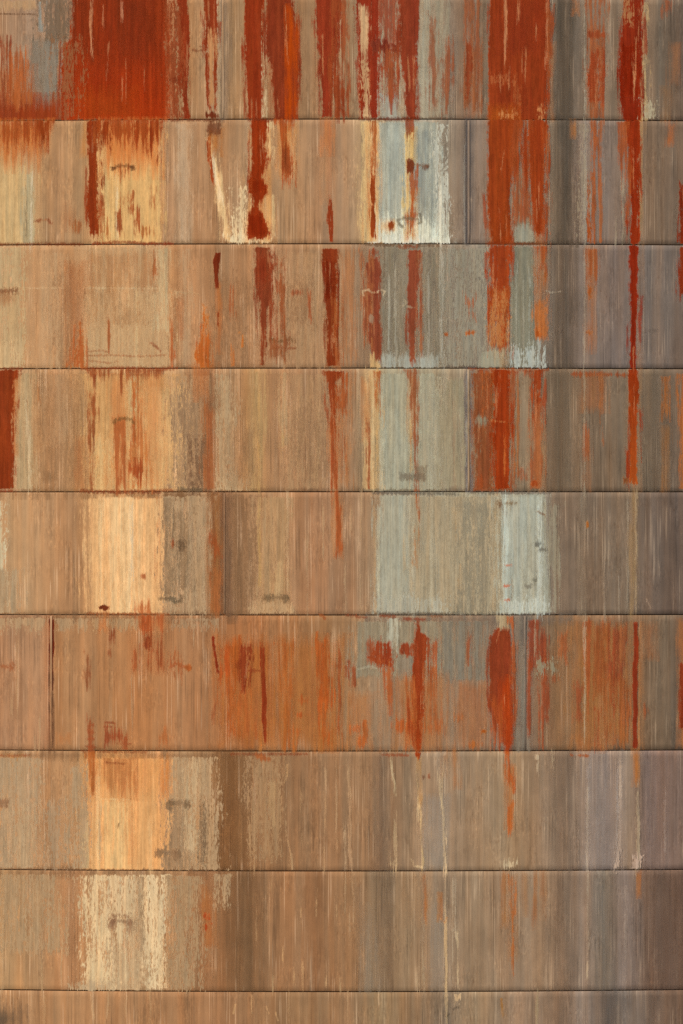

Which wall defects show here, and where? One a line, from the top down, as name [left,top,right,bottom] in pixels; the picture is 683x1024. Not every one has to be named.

corrosion [0,0,190,238]
corrosion [203,0,219,119]
corrosion [244,0,311,365]
corrosion [315,0,554,414]
corrosion [573,0,648,484]
corrosion [0,369,19,489]
corrosion [70,322,175,493]
corrosion [322,199,348,555]
corrosion [471,369,545,489]
corrosion [367,621,443,759]
corrosion [469,615,567,835]
corrosion [576,618,646,780]